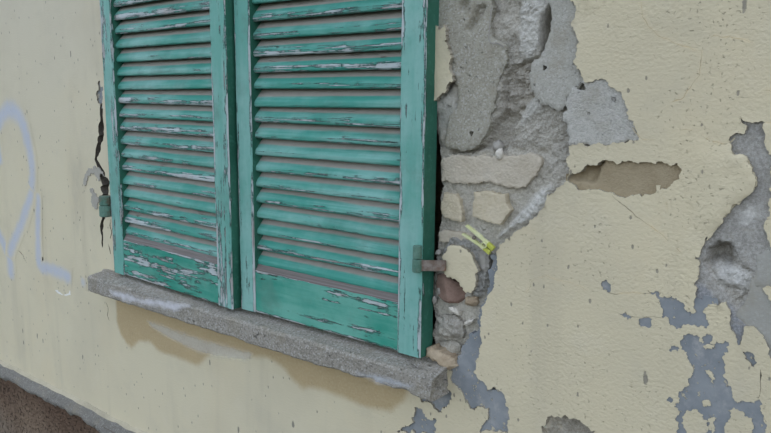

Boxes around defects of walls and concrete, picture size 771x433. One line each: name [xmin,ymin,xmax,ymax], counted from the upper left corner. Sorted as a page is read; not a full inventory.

crack [95,103,110,195]
crack [100,217,112,254]
flaking render [399,0,682,433]
flaking render [645,120,771,433]